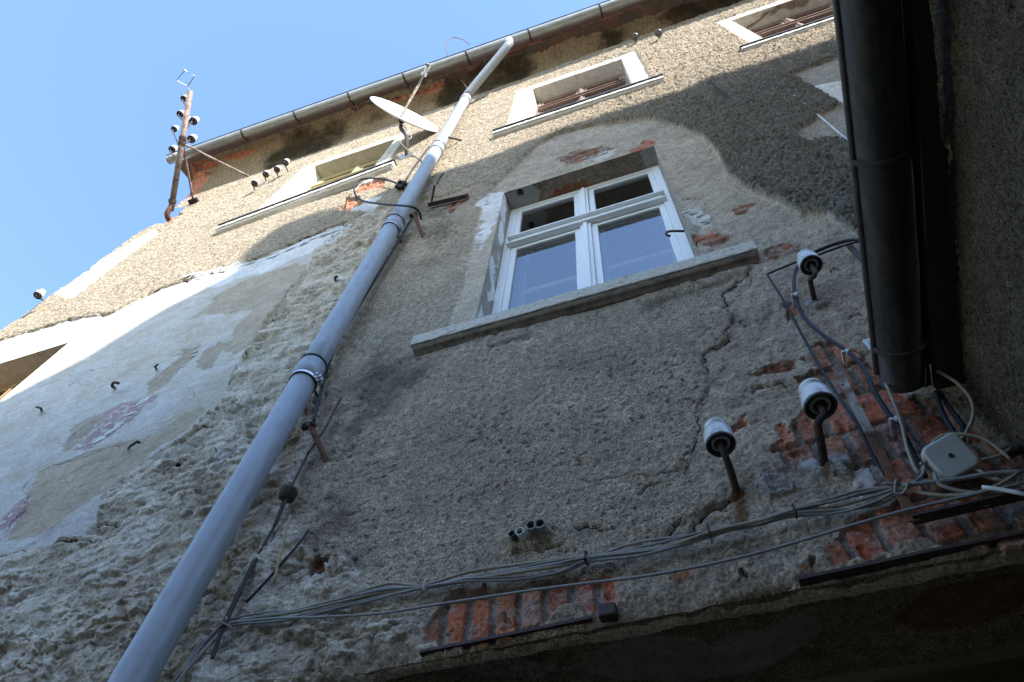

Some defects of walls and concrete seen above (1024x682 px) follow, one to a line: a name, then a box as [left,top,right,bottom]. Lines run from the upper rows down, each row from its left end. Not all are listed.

spalling [556,140,659,168]
spalling [186,159,222,199]
flaking render [679,208,733,247]
spalling [732,202,758,215]
spalling [762,242,800,261]
peeling [0,178,388,548]
crack [579,270,753,495]
spalling [731,413,749,432]
spalling [749,340,1024,571]
crack [662,501,734,544]
spalling [422,572,620,656]